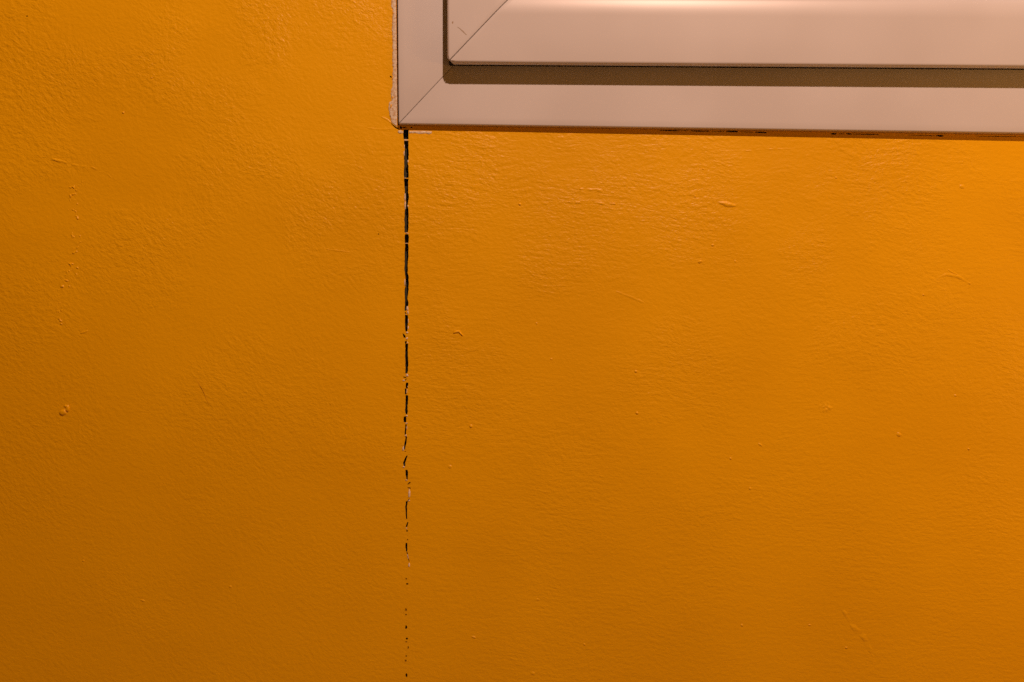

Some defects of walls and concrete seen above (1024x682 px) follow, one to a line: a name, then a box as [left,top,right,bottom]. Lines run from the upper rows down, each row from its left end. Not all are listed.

crack [391,123,412,677]